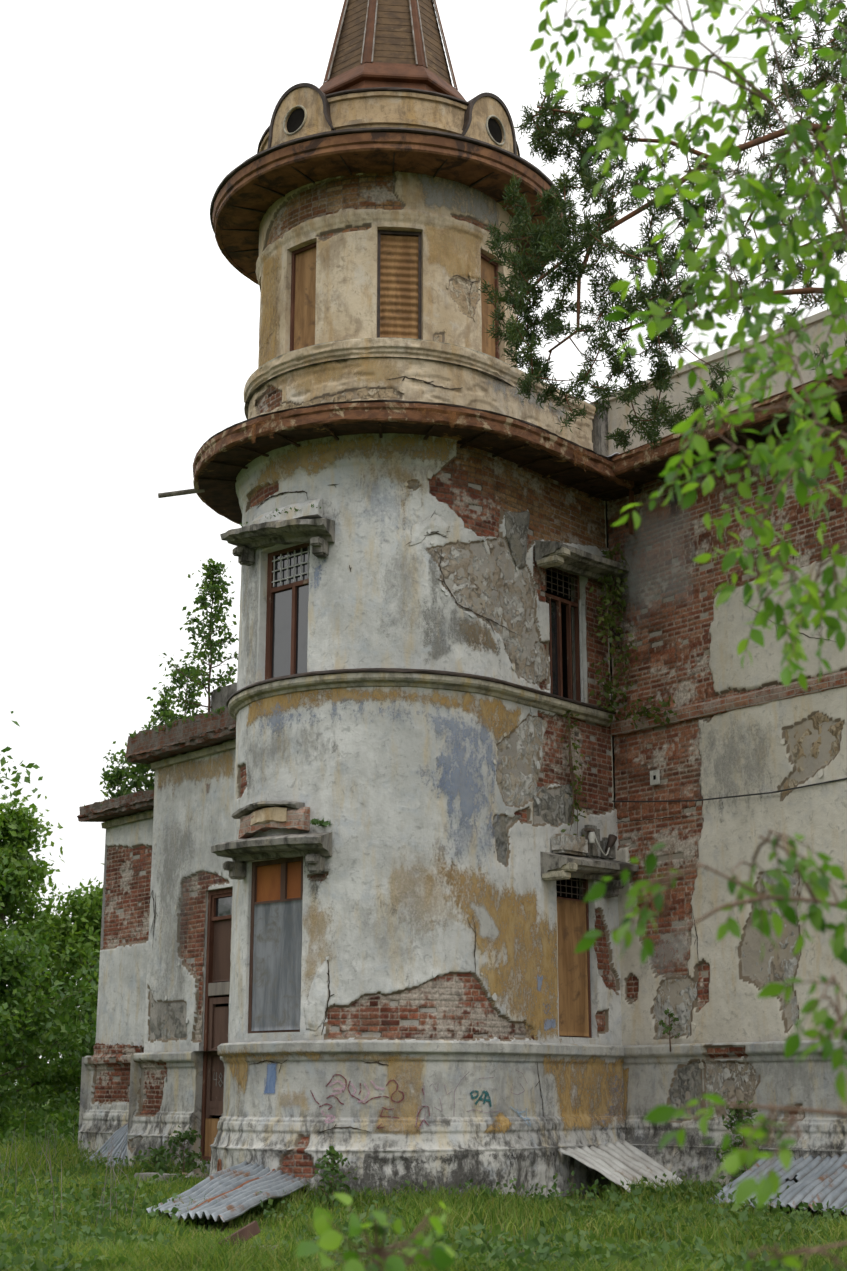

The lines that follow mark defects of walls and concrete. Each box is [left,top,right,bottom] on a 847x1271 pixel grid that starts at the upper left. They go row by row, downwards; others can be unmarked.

flaking render [259,171,403,365]
flaking render [246,411,847,1040]
flaking render [103,846,152,949]
flaking render [91,870,229,1116]
peeling [218,1047,423,1134]
peeling [484,1112,511,1134]